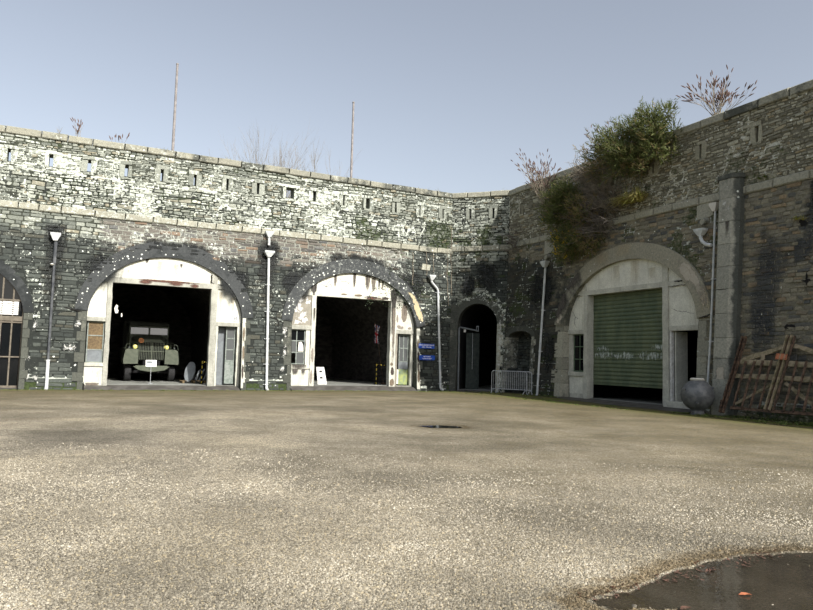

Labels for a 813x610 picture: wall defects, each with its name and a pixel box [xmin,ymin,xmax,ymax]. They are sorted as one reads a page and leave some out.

rust [140,279,199,288]
peeling [295,297,316,324]